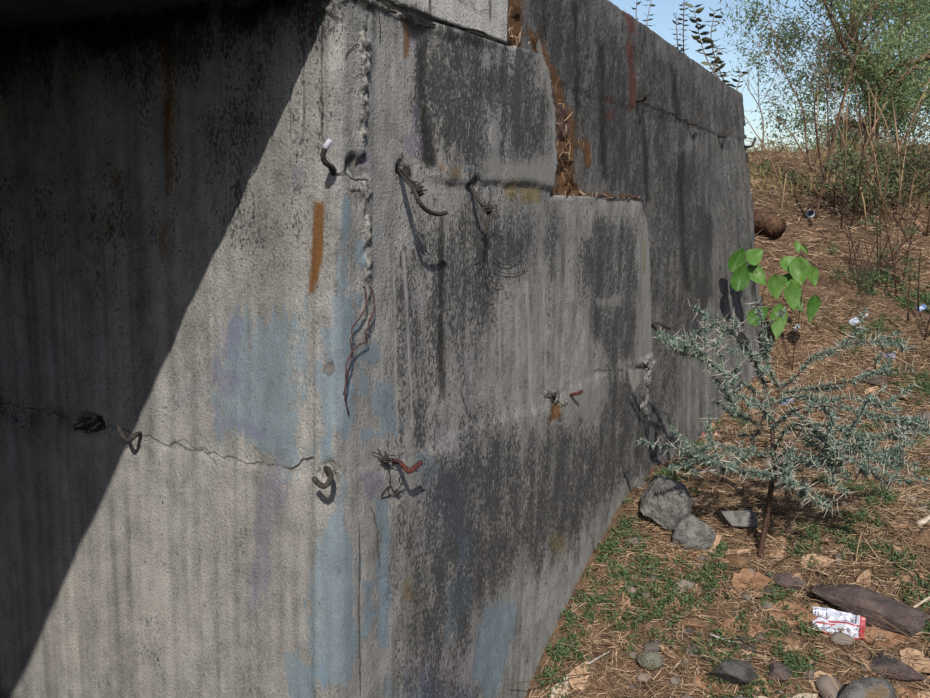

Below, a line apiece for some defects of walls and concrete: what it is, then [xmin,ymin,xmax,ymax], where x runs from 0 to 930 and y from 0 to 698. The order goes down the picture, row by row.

crack [344,0,506,79]
corrosion [309,201,324,292]
crack [0,401,319,478]
corrosion [549,404,560,422]